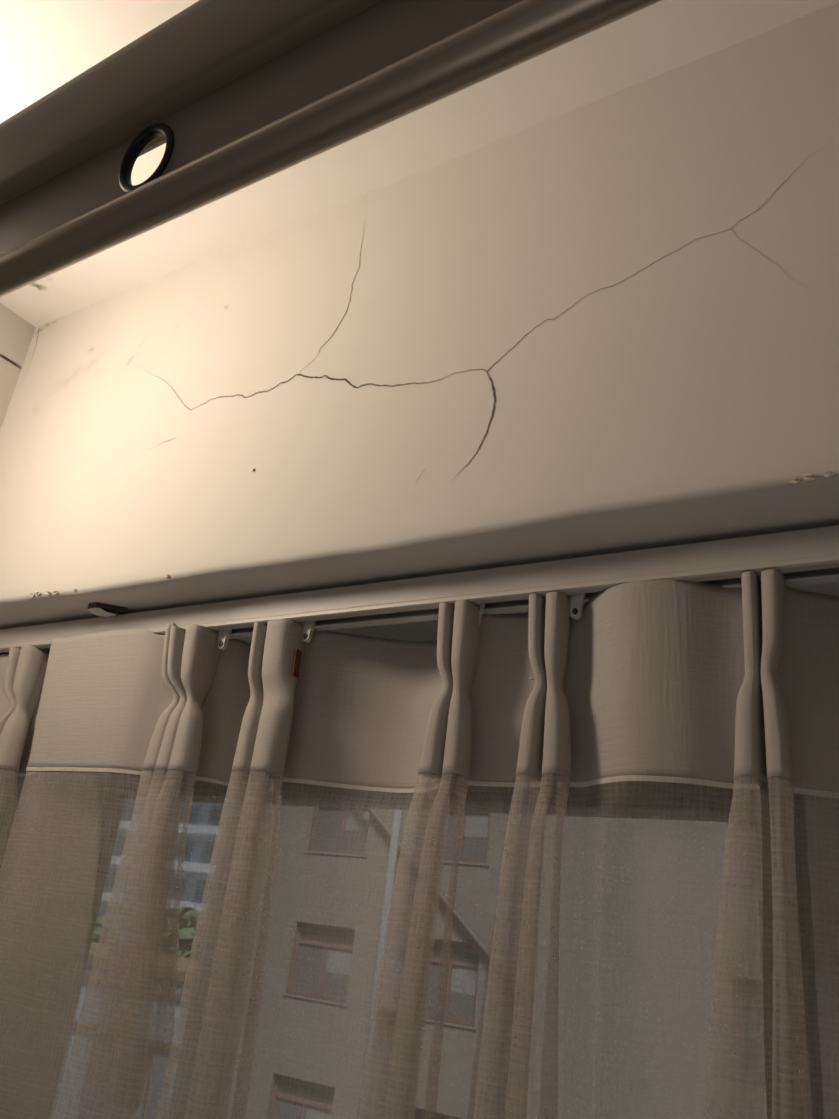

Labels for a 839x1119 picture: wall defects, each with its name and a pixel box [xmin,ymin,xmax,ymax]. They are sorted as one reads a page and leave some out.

crack [324,251,361,344]
crack [223,374,421,398]
crack [469,335,526,463]